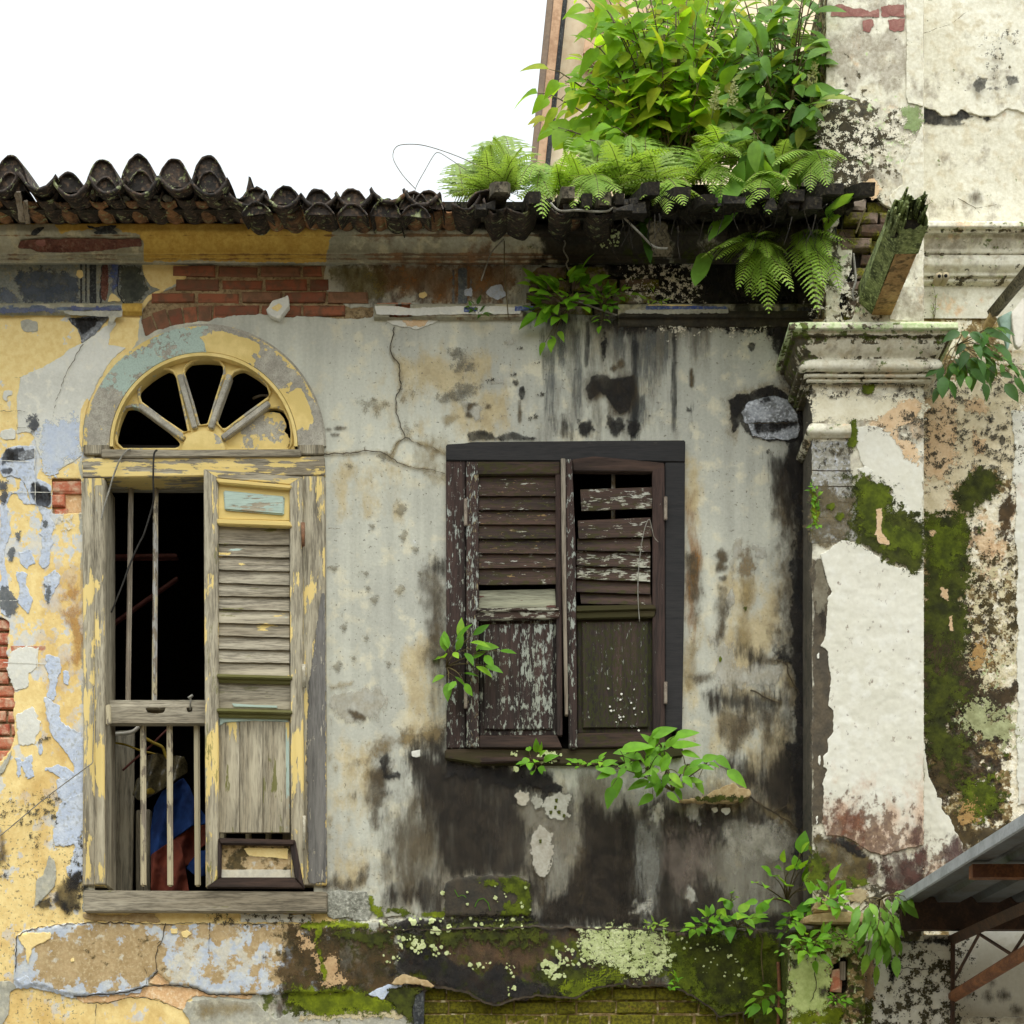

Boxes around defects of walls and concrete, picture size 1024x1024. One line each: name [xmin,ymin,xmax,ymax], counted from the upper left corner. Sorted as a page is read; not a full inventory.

spalling [830,4,905,32]
damp [606,264,800,304]
spalling [837,124,924,322]
crack [324,328,445,474]
damp [467,315,788,441]
spalling [0,225,728,847]
damp [993,485,1016,539]
damp [274,429,931,1004]
flaking render [728,359,1024,877]
damp [924,625,1019,713]
damp [927,734,1010,850]
flaking render [13,913,340,1010]